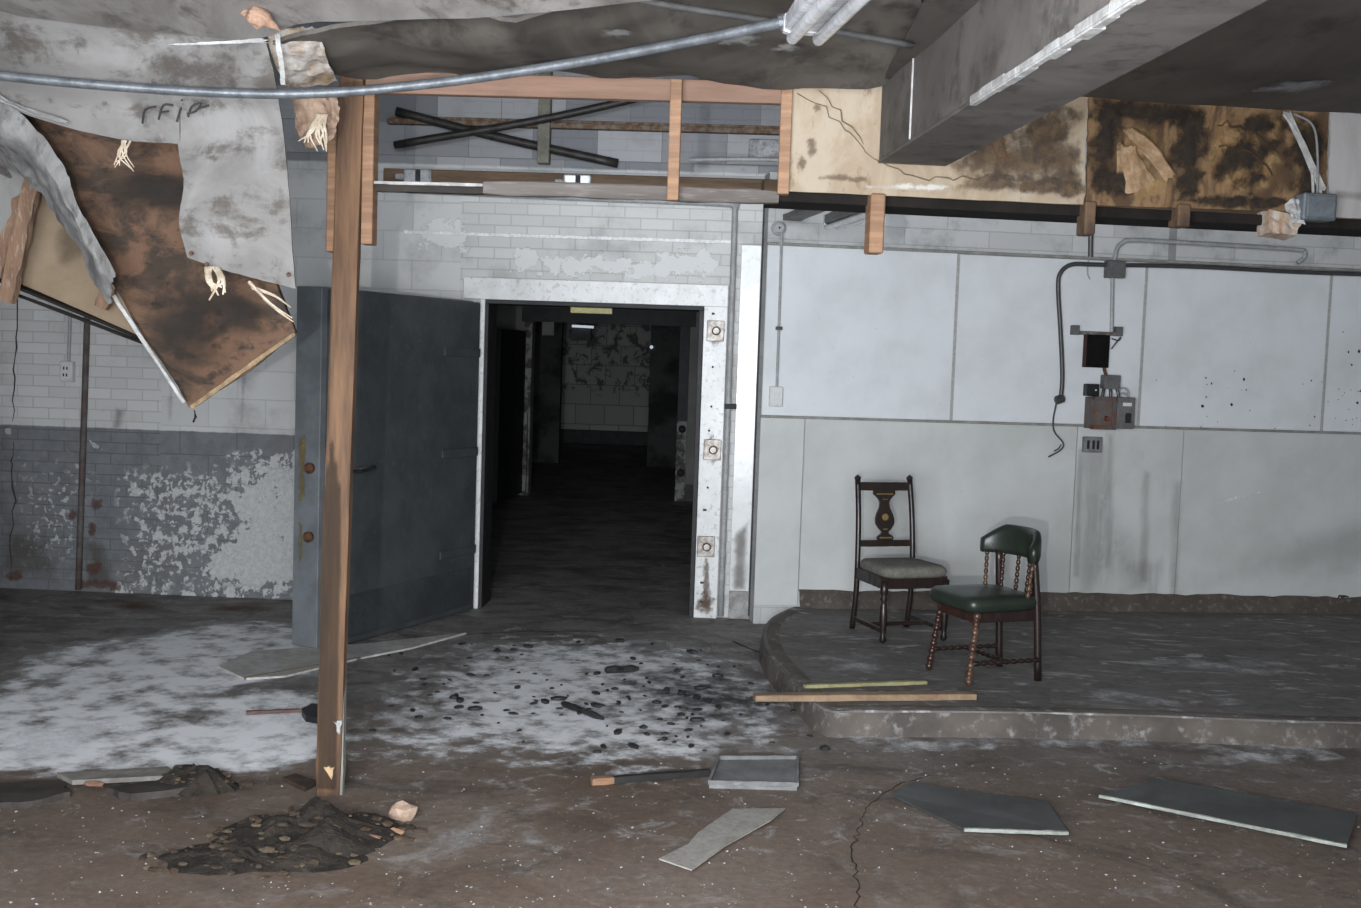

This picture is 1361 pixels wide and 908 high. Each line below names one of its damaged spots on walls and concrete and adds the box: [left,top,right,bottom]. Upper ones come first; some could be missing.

crack [797,90,1025,181]
leakage [892,183,947,191]
leakage [957,99,1327,210]
peeling [25,463,79,560]
peeling [115,448,295,599]
crack [850,774,931,908]